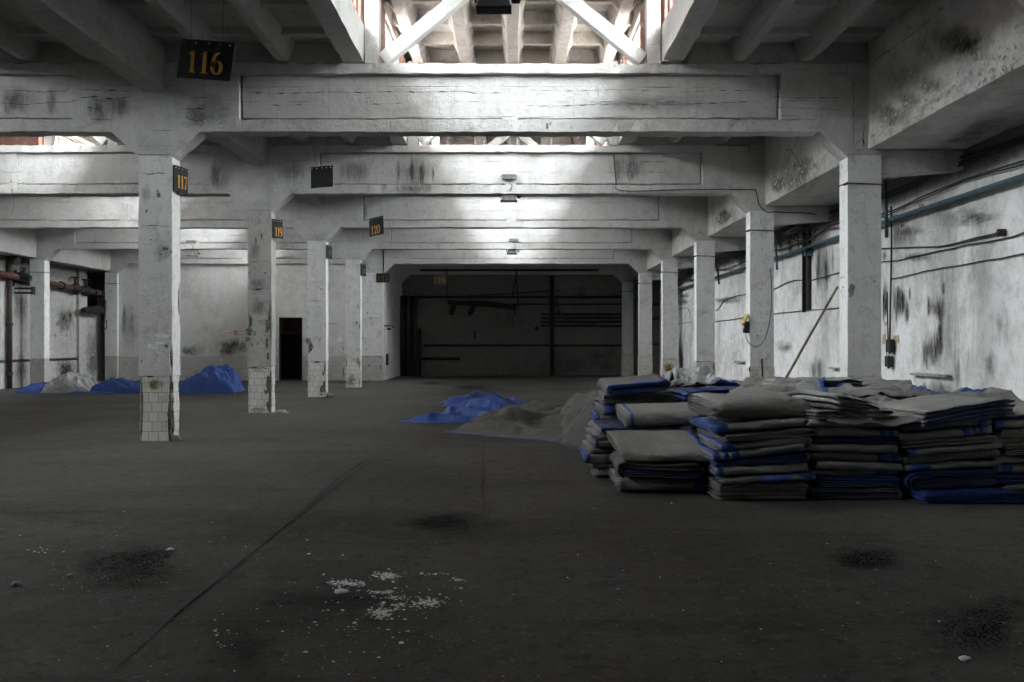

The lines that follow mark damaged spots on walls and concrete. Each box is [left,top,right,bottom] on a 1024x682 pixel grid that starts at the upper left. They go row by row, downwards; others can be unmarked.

leakage [883,289,910,320]
leakage [923,284,945,364]